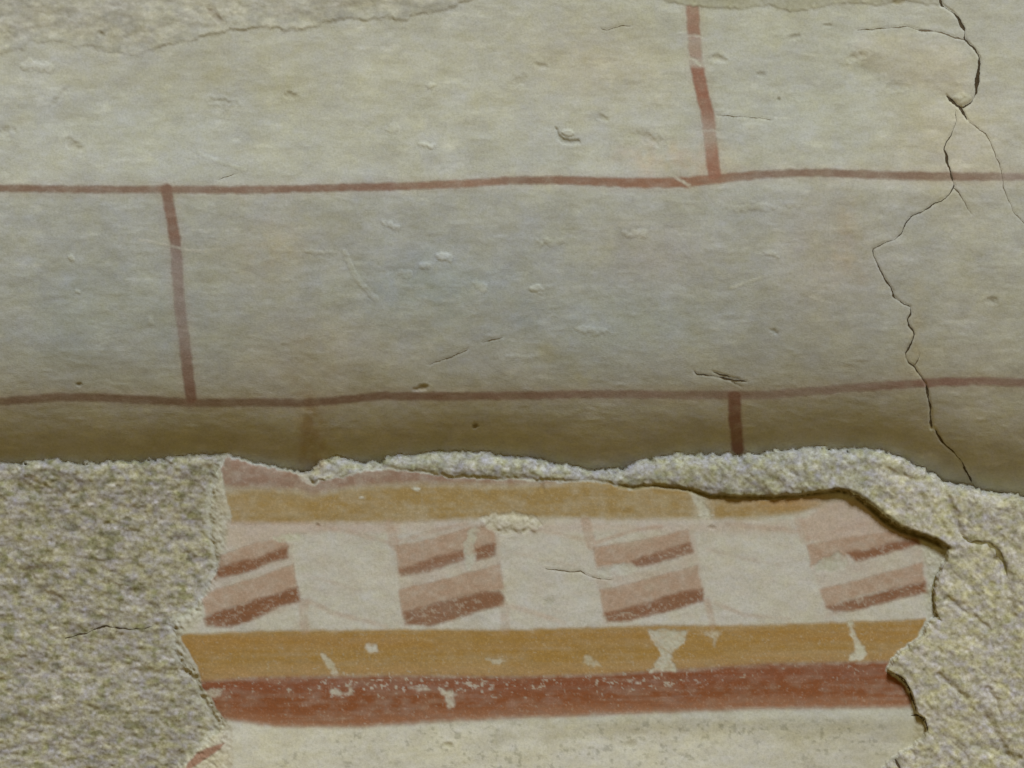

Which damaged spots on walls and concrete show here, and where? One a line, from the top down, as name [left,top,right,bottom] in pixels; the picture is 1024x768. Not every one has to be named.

crack [861,0,1024,482]
crack [694,371,747,384]
peeling [296,469,315,487]
spalling [0,452,259,768]
spalling [357,446,1024,768]
crack [66,625,151,638]
peeling [321,653,340,675]
peeling [330,686,353,696]